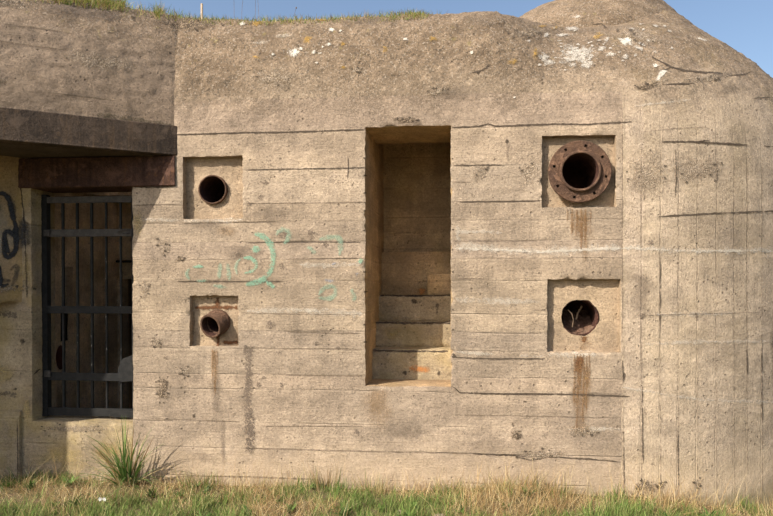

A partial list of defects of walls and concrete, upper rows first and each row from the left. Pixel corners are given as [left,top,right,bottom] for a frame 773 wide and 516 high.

crack [652,56,750,85]
damp [243,345,266,452]